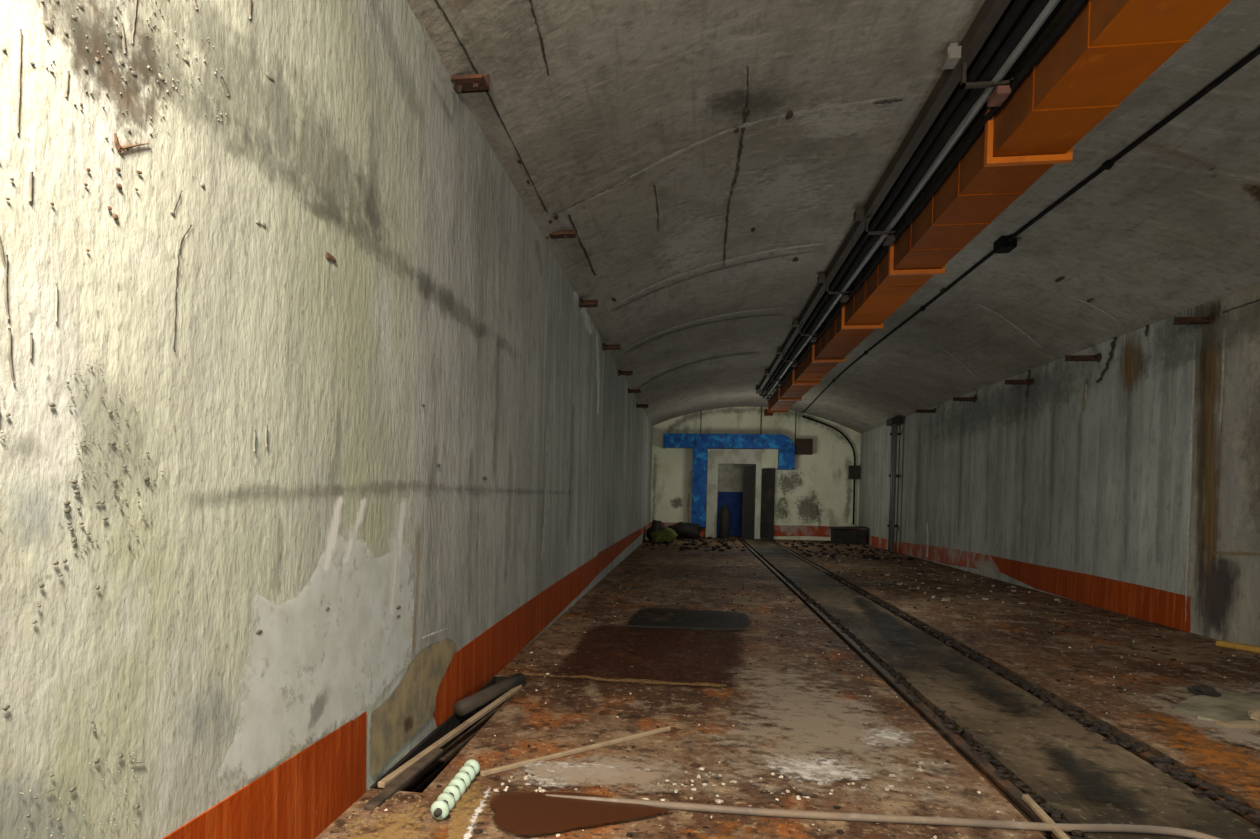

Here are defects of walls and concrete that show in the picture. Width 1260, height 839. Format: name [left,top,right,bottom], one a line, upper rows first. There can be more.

water stain [30,0,230,151]
crack [173,191,193,352]
crack [652,185,660,232]
crack [723,66,749,267]
rust [1185,303,1260,597]
spalling [370,627,456,778]